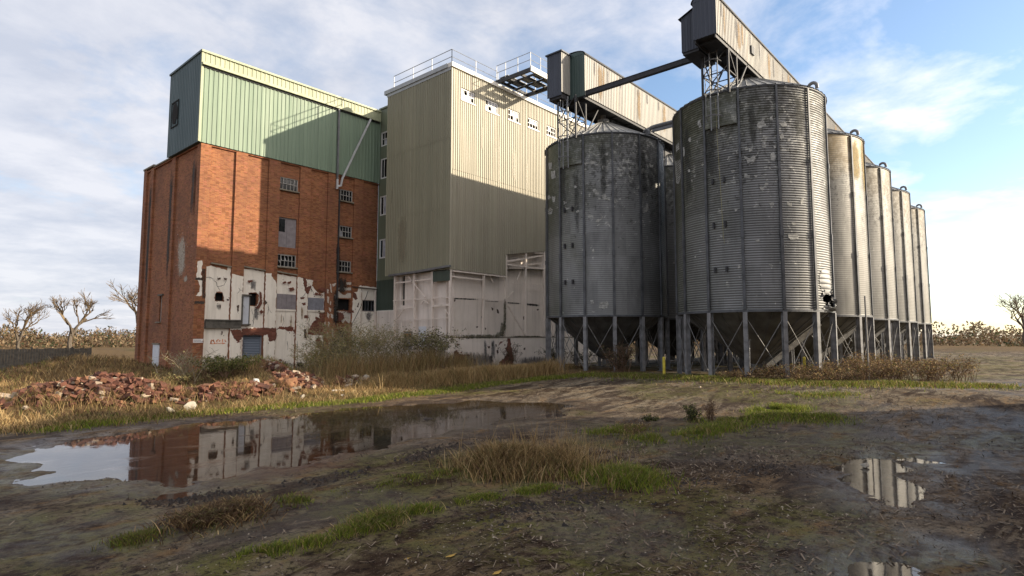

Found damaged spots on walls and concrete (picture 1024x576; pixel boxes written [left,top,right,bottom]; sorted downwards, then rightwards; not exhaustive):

spalling [194,269,239,314]
peeling [221,277,359,357]